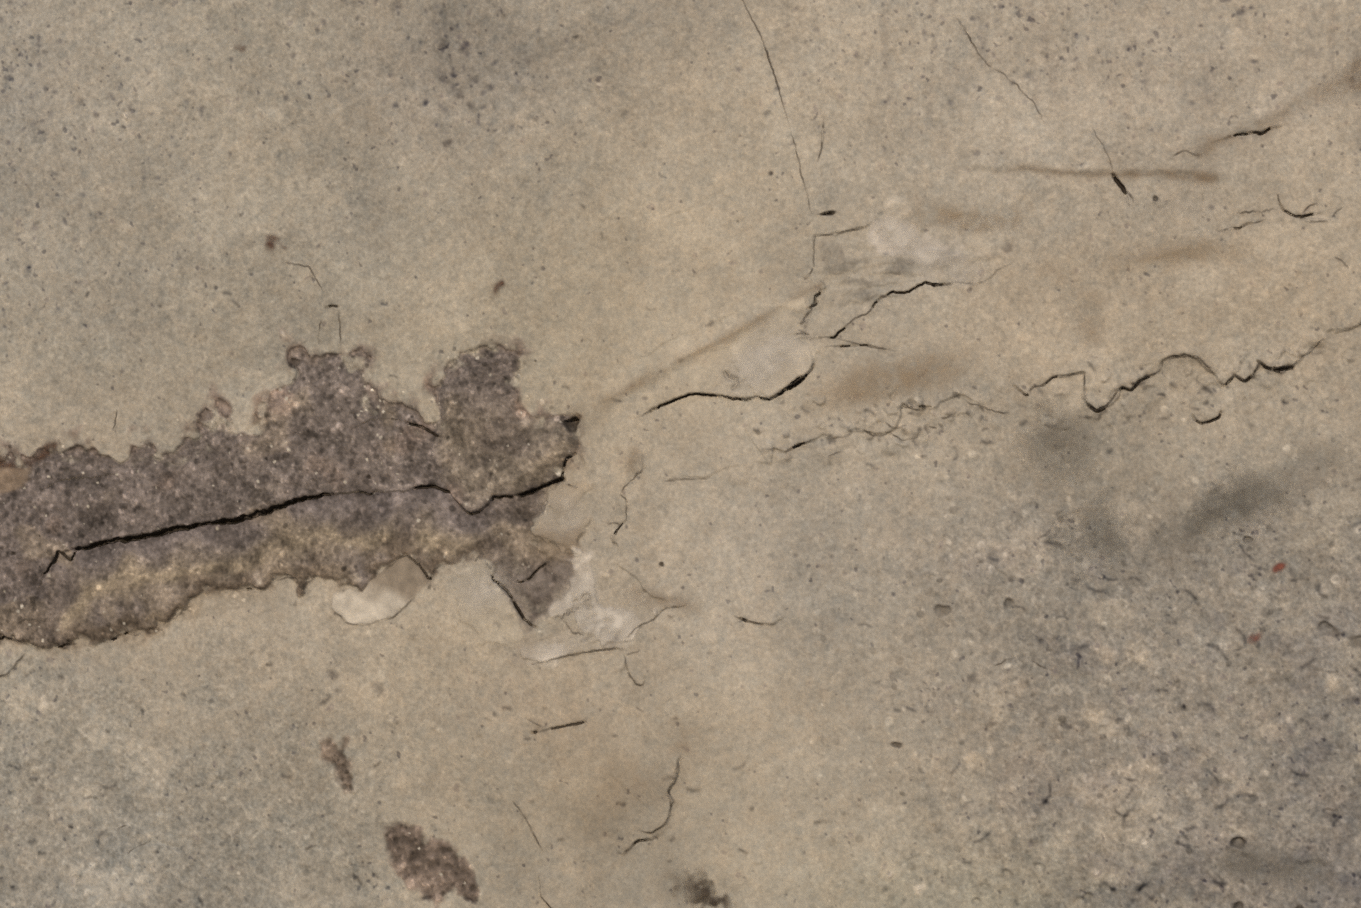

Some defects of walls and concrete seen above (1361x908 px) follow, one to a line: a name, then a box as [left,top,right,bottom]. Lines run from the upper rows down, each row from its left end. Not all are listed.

crack [1113,176,1131,196]
crack [1233,198,1313,229]
crack [797,260,947,349]
crack [657,374,807,409]
crack [866,373,1155,437]
crack [1196,361,1293,424]
crack [43,455,572,574]
spalling [0,344,663,666]
crack [476,557,546,626]
spalling [320,736,353,794]
spalling [385,823,480,906]
leakage [695,881,726,906]